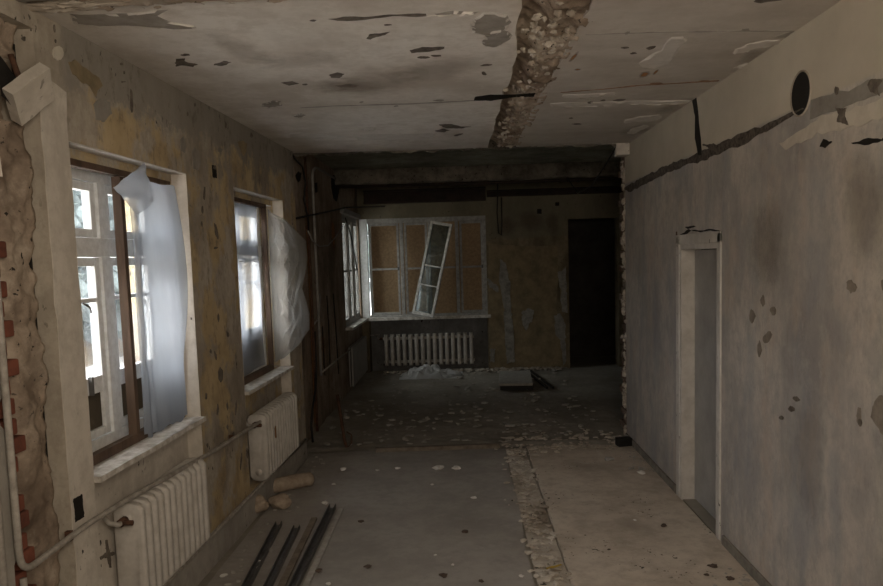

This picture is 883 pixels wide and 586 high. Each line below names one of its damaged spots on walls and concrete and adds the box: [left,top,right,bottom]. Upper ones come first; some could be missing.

spalling [26,0,286,29]
peeling [175,54,198,67]
spalling [329,0,691,148]
peeling [779,78,883,150]
spalling [0,17,63,586]